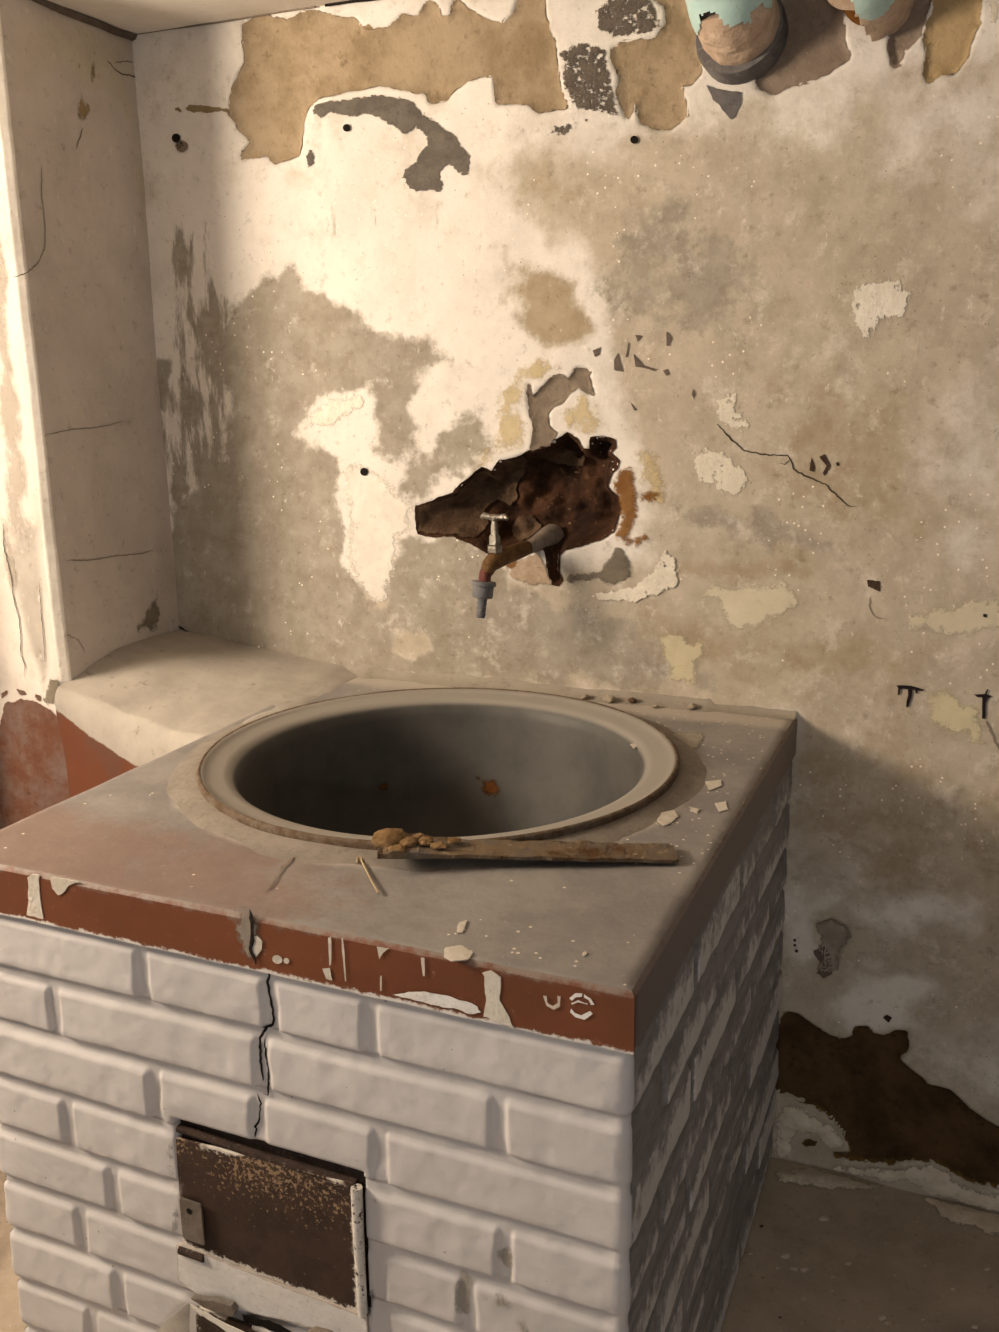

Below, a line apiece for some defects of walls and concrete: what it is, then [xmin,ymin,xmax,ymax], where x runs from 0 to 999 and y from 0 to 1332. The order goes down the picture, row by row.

peeling [228,0,568,165]
peeling [610,0,702,130]
peeling [886,0,999,83]
leakage [0,253,25,586]
spalling [415,335,670,586]
crack [717,424,855,507]
crack [249,856,295,1137]
spalling [793,919,851,979]
leakage [775,1106,999,1236]